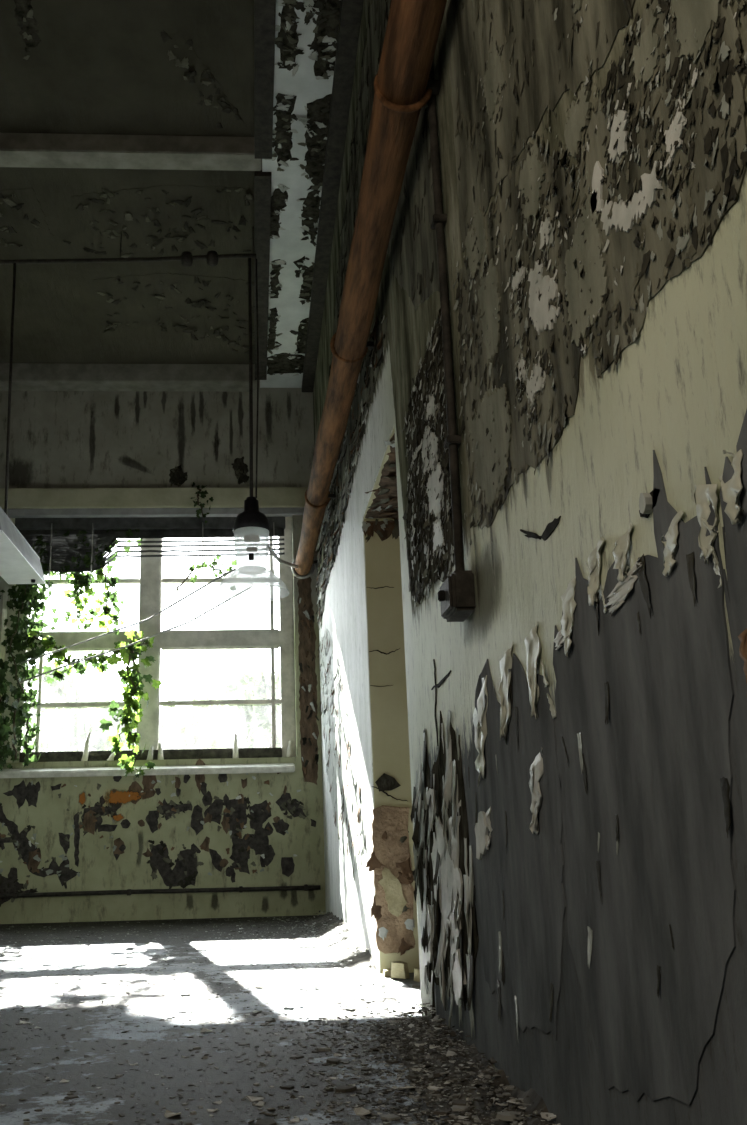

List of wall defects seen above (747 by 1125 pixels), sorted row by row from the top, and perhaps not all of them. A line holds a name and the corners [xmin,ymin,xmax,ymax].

peeling [274,0,341,80]
peeling [265,93,332,376]
peeling [0,316,747,1105]